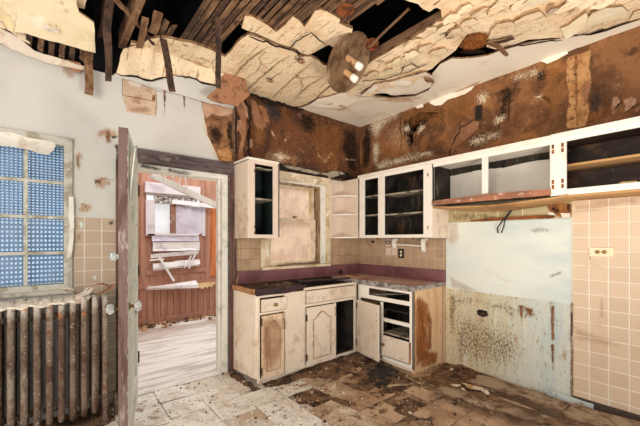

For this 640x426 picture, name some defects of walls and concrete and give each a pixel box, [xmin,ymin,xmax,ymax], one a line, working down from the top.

flaking render [122,78,156,115]
flaking render [201,100,275,163]
crack [233,32,326,157]
peeling [308,92,381,109]
water stain [301,112,433,171]
crack [362,63,426,82]
peeling [416,85,475,109]
flaking render [384,0,547,72]
water stain [467,67,545,146]
peeling [542,51,568,64]
flaking render [554,0,615,14]
water stain [448,295,519,369]